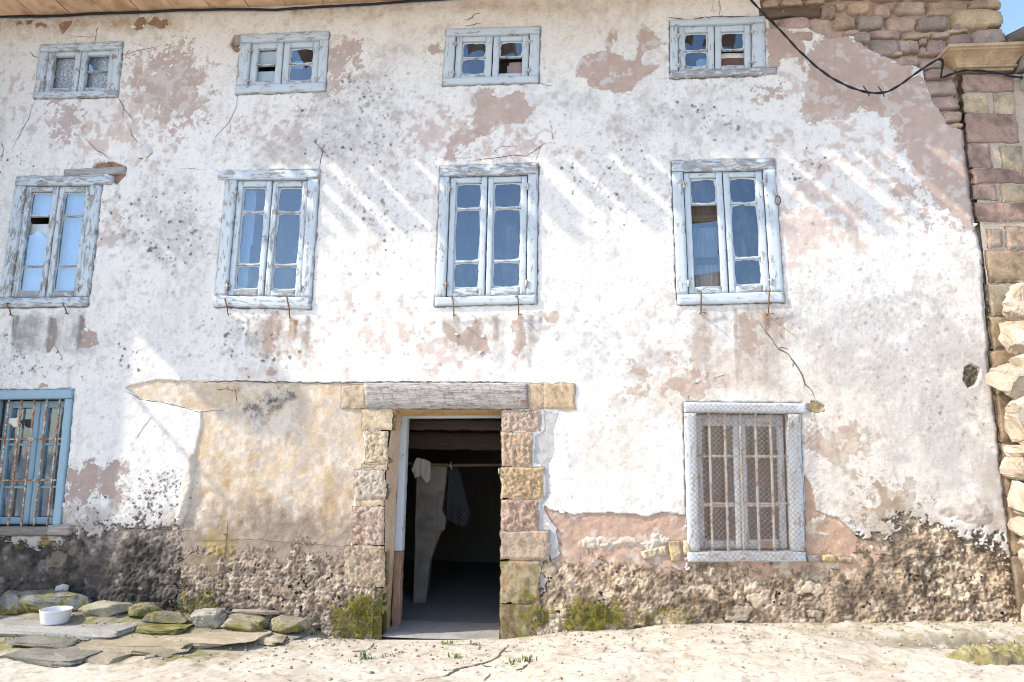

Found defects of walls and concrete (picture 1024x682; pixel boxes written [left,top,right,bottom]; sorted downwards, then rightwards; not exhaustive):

peeling [327,33,365,101]
peeling [576,23,665,95]
peeling [444,87,536,163]
peeling [765,25,978,244]
crack [757,320,814,396]
water stain [72,470,191,542]
peeling [0,311,375,639]
spalling [529,400,1022,636]